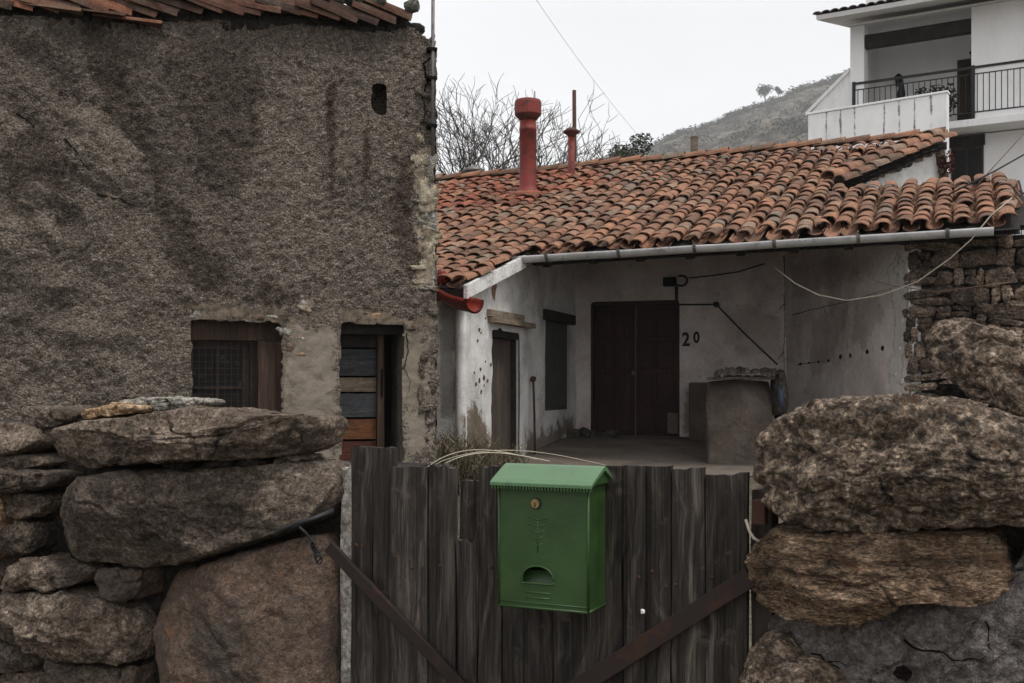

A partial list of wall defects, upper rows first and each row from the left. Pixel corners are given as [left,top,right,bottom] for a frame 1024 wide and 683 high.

flaking render [410,134,449,292]
crack [904,621,994,663]